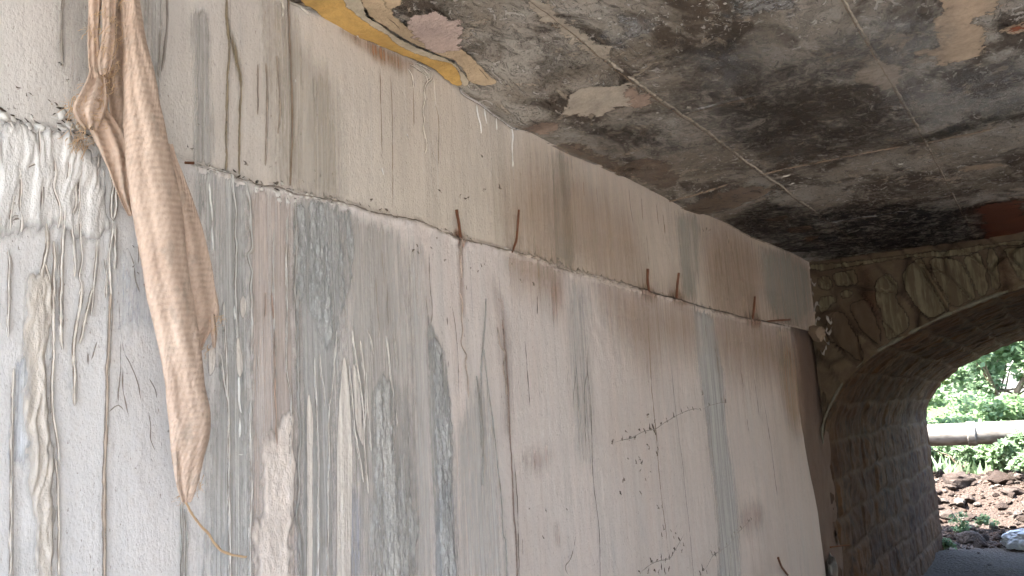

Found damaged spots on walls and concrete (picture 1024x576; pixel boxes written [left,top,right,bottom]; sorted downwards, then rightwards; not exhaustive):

peeling [301,0,496,86]
peeling [838,0,1024,91]
peeling [523,83,680,191]
corrosion [455,209,464,246]
corrosion [969,199,1024,239]
damp [194,0,254,576]
damp [297,76,455,576]
crack [191,160,789,576]
damp [694,307,740,576]